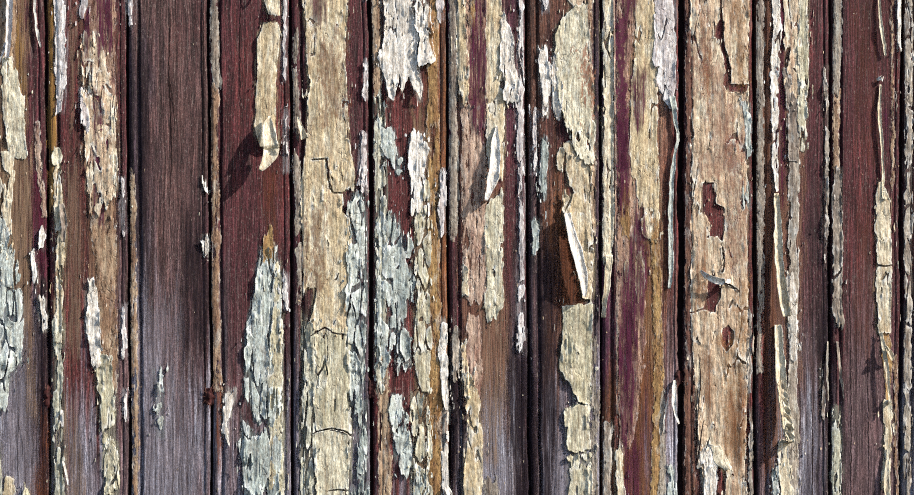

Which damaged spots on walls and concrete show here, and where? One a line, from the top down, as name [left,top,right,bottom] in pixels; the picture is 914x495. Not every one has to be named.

peeling [0,0,69,495]
peeling [49,0,140,495]
peeling [153,366,169,440]
crack [312,158,341,193]
crack [311,327,347,361]
peeling [200,0,847,495]
peeling [869,0,914,495]